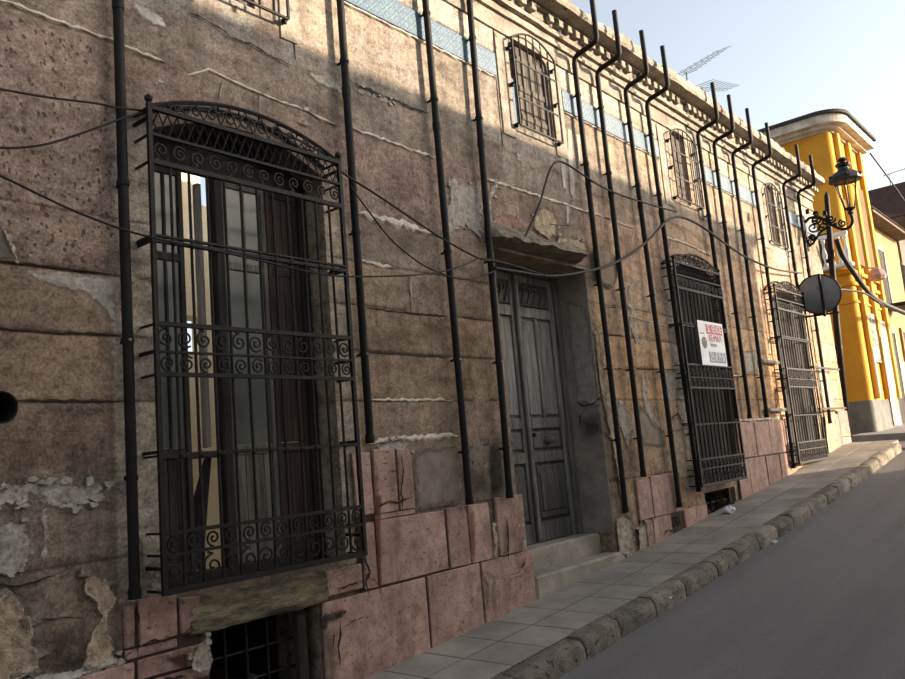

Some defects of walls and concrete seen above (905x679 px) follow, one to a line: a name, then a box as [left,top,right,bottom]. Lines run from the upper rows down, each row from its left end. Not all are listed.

flaking render [447,176,587,257]
crack [378,454,412,508]
spalling [0,476,126,679]
crack [337,556,378,593]
spalling [187,632,213,672]
crack [333,616,366,670]